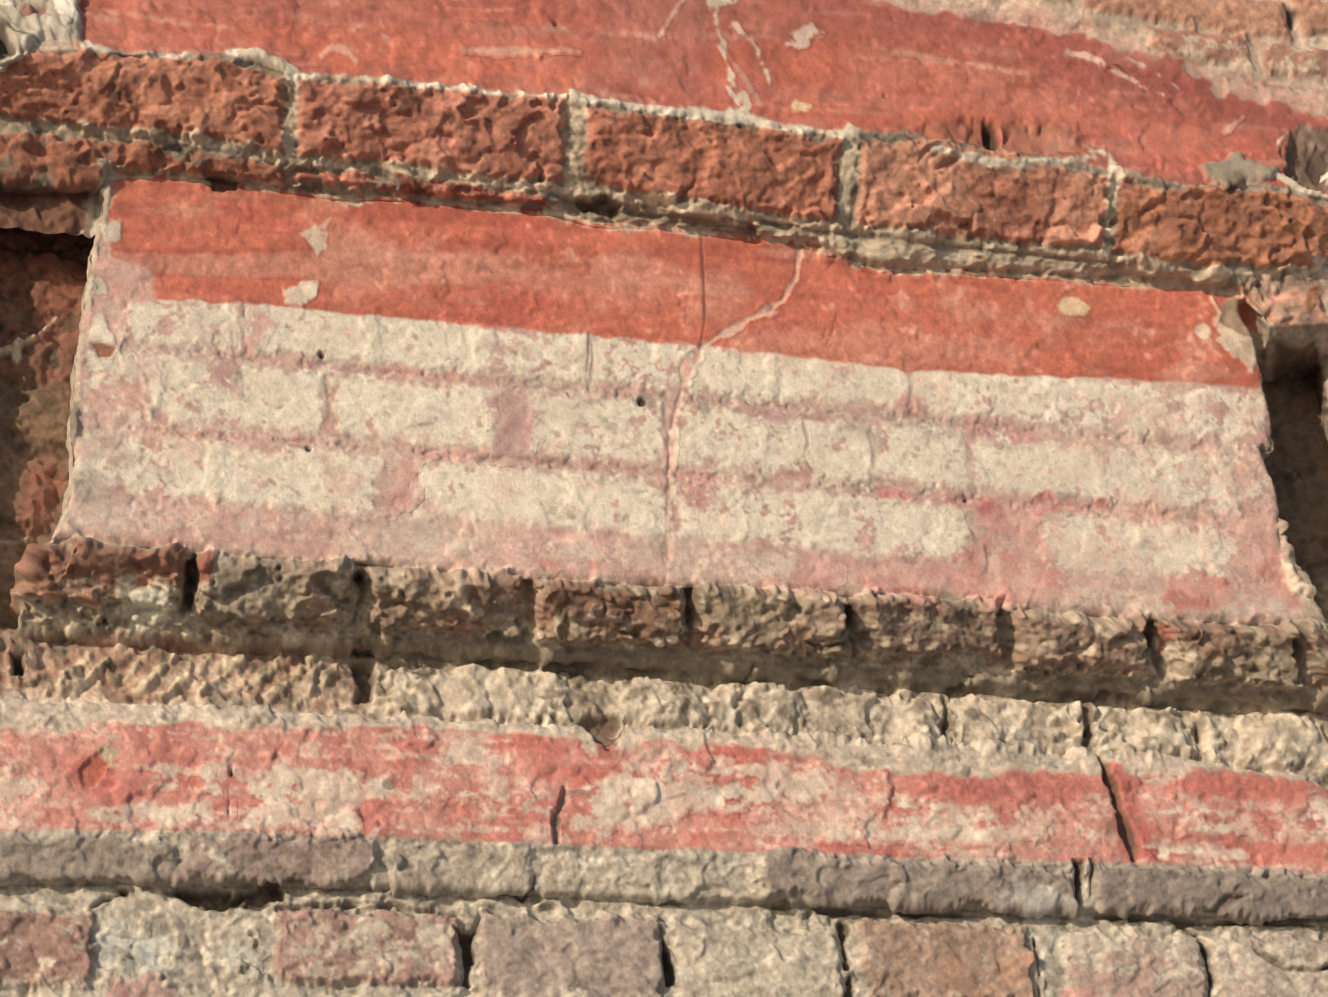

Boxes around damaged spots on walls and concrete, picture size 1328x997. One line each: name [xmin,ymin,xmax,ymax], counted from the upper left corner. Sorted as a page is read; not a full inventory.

spalling [0,0,85,73]
peeling [704,0,776,114]
spalling [907,114,1106,156]
spalling [1274,120,1328,200]
crack [656,235,805,571]
crack [789,419,818,478]
peeling [1151,295,1328,658]
peeling [77,732,519,843]
peeling [567,736,1055,852]
crack [1096,755,1143,864]
peeling [1110,747,1264,865]
peeling [1298,767,1328,844]